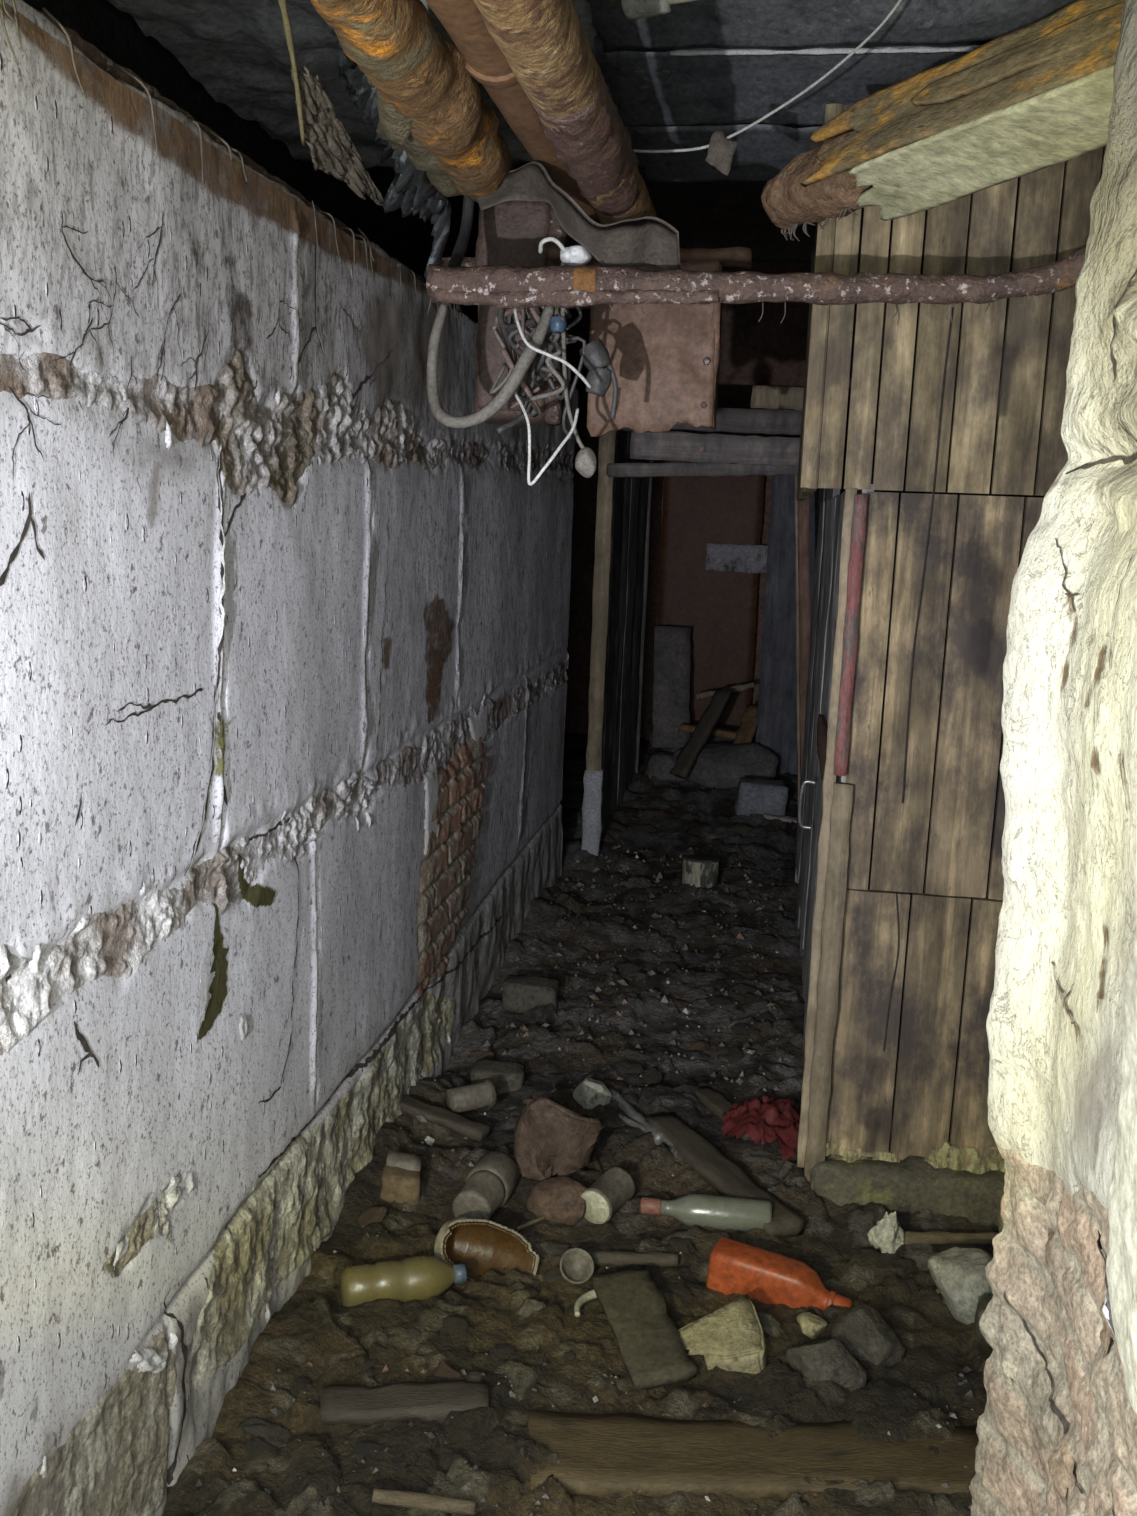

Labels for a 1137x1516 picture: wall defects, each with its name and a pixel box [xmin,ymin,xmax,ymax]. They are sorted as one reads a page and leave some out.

crack [0,212,209,586]
spalling [0,348,574,509]
crack [1065,269,1137,474]
crack [371,498,390,772]
rust [382,638,391,669]
rust [423,597,454,724]
crack [106,440,300,1104]
spalling [0,654,569,1516]
crack [258,917,502,1178]
crack [1097,1231,1108,1289]
crack [1003,1292,1083,1494]